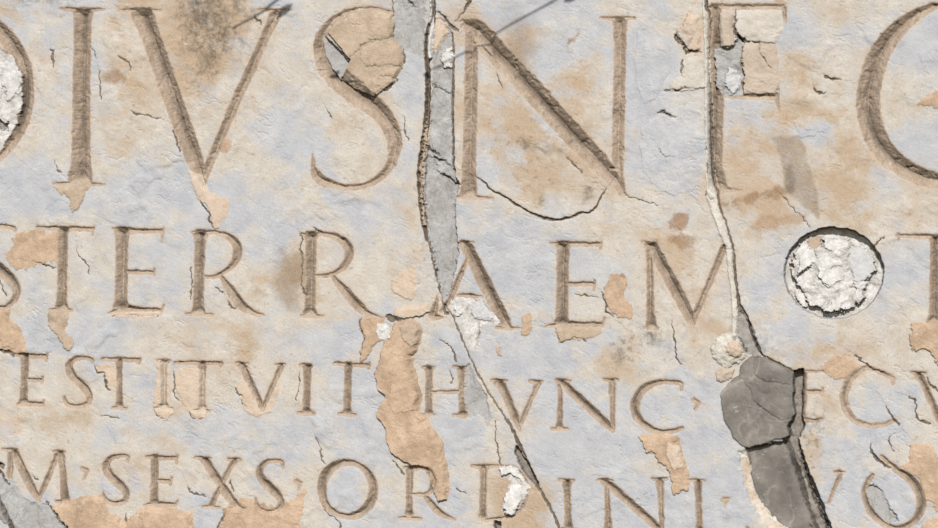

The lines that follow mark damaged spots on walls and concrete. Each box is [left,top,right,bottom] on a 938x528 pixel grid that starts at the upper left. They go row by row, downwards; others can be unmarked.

spalling [0,48,24,150]
crack [657,0,760,114]
peeling [670,9,784,98]
crack [813,75,841,95]
spalling [323,0,501,349]
peeling [359,266,451,502]
crack [378,0,658,528]
crack [671,323,682,365]
crack [705,82,832,528]
spalling [784,227,884,319]
peeling [0,472,195,528]
spalling [499,465,531,516]